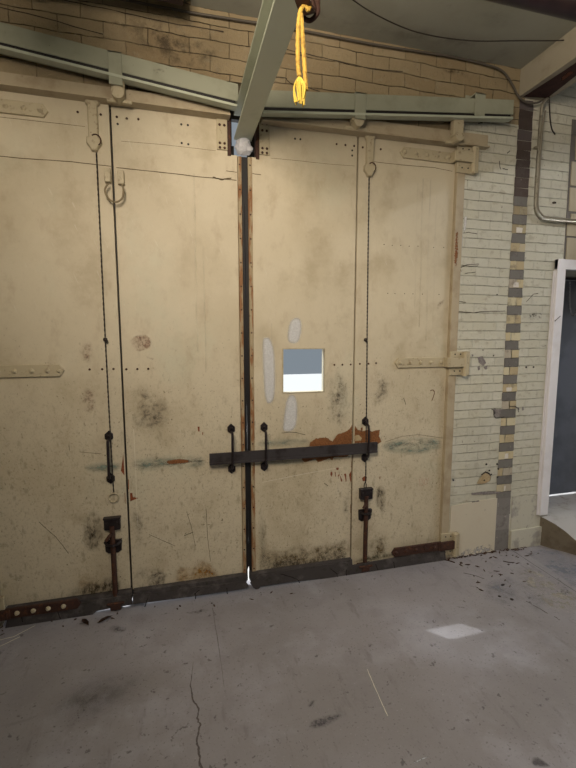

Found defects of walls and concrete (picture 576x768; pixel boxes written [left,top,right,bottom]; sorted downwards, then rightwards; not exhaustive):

crack [190,668,203,768]